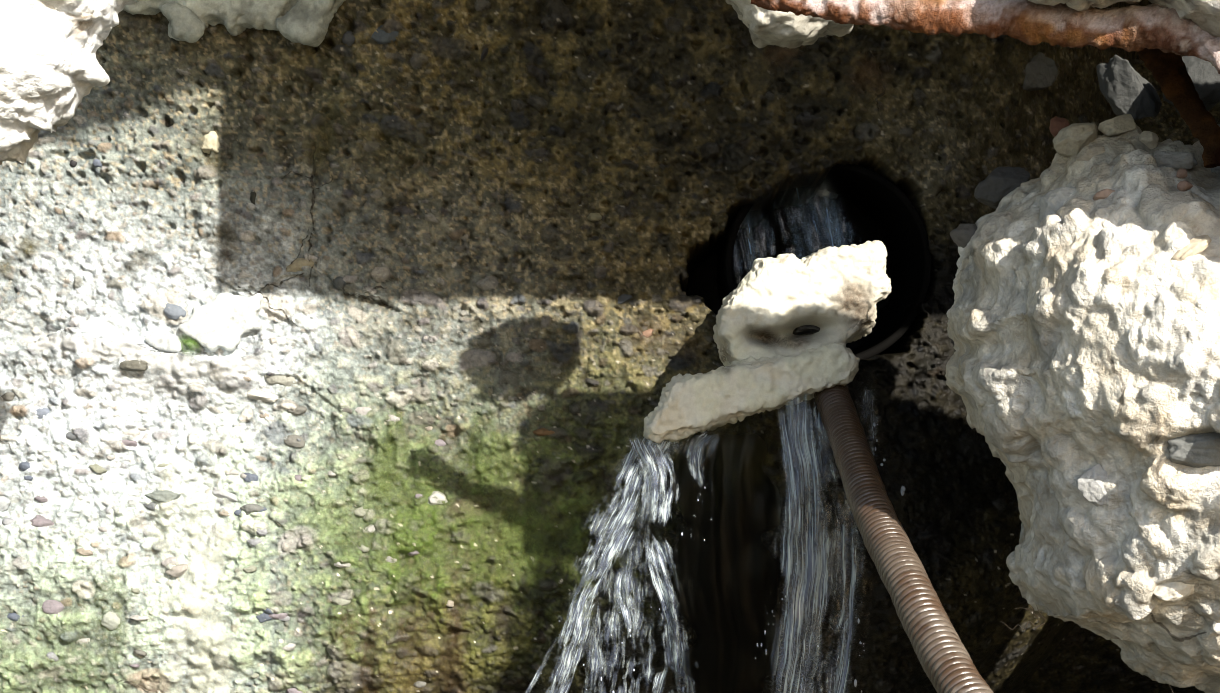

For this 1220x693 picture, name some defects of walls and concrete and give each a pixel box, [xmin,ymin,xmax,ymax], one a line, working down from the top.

crack [238,148,394,326]
efflorescence [183,528,227,693]